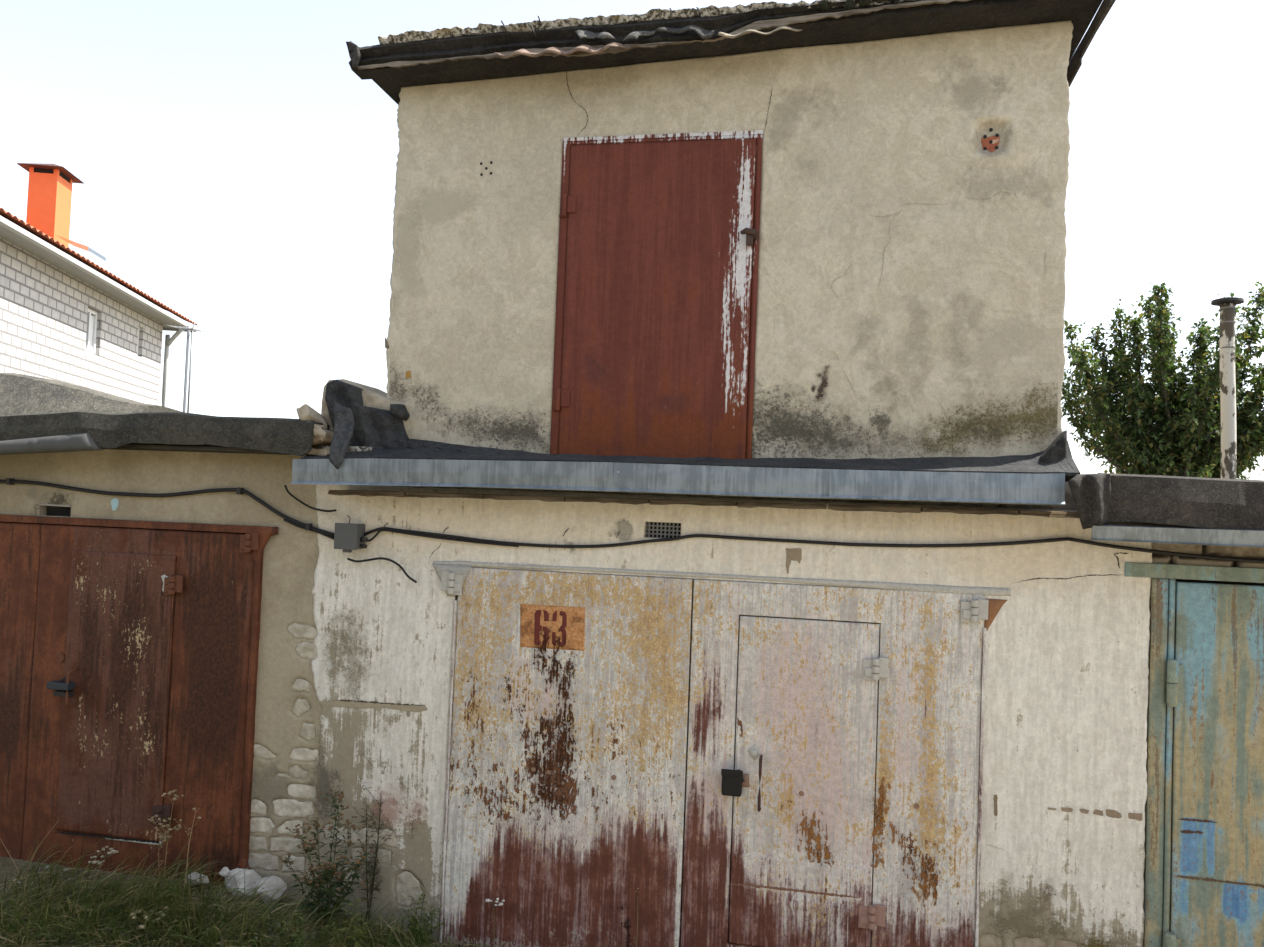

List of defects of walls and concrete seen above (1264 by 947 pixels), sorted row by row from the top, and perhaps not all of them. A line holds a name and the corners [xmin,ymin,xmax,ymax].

damp [389,366,547,452]
damp [745,365,891,458]
flaking render [287,623,317,660]
corrosion [498,672,520,719]
corrosion [520,628,581,818]
peeling [248,679,427,874]
flaking render [322,824,422,907]
corrosion [795,810,846,868]
corrosion [867,777,947,907]
flaking render [978,933,1078,947]
damp [990,879,1074,938]